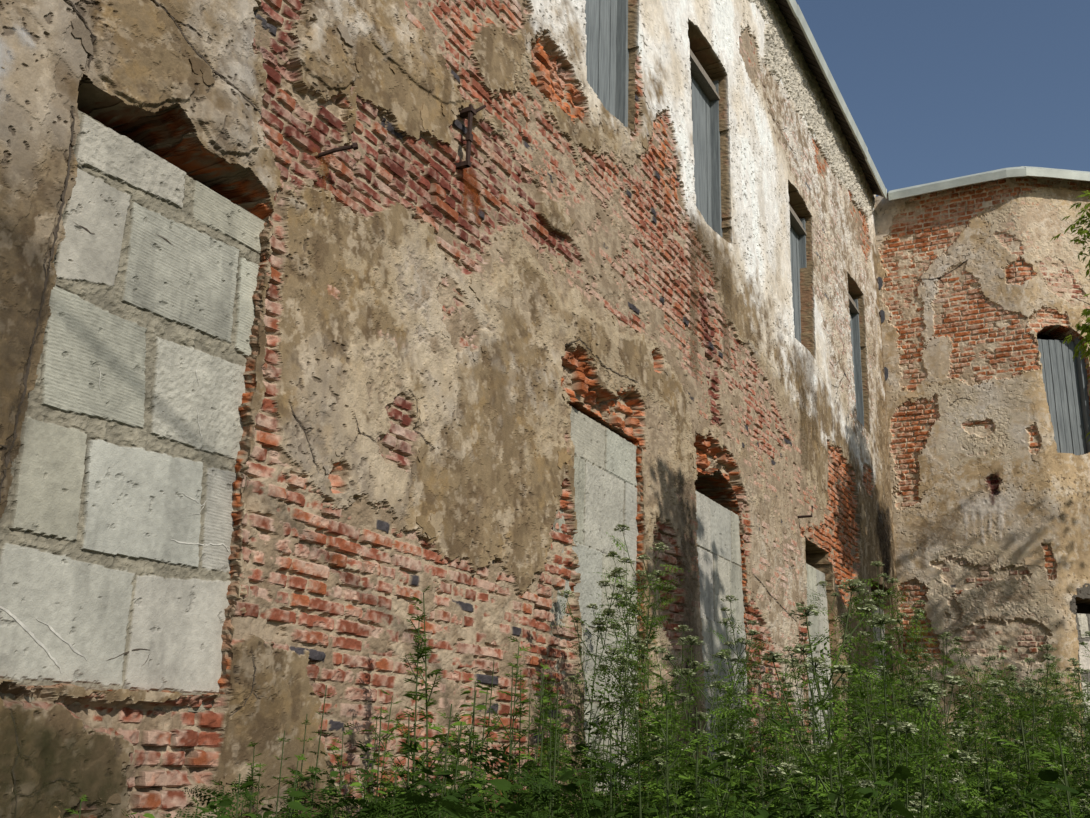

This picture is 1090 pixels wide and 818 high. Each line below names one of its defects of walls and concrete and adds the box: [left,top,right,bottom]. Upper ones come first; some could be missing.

crack [65,0,97,71]
crack [154,0,263,125]
spalling [736,0,1090,511]
crack [290,404,318,469]
spalling [231,0,794,818]
spalling [800,439,877,613]